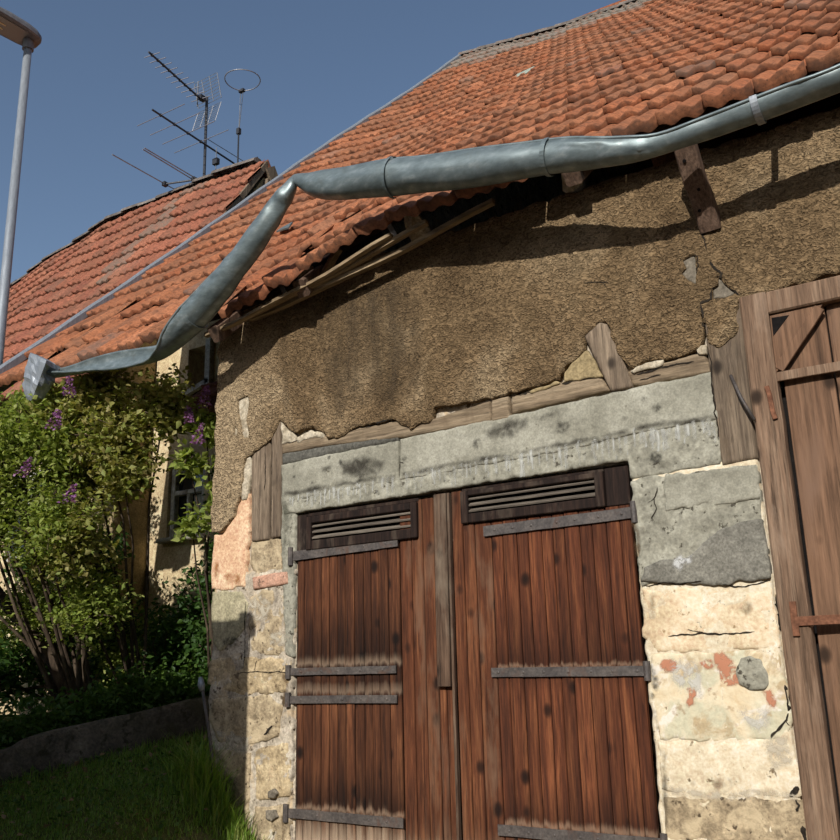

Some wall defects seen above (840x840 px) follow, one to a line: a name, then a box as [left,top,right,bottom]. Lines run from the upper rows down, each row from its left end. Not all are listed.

peeling [683,256,696,284]
crack [636,233,739,440]
peeling [530,350,604,393]
peeling [631,360,666,374]
peeling [235,397,249,438]
peeling [281,422,325,444]
peeling [241,457,252,500]
leakage [289,459,393,505]
crack [644,579,700,587]
crack [723,580,781,631]
crack [668,629,754,637]